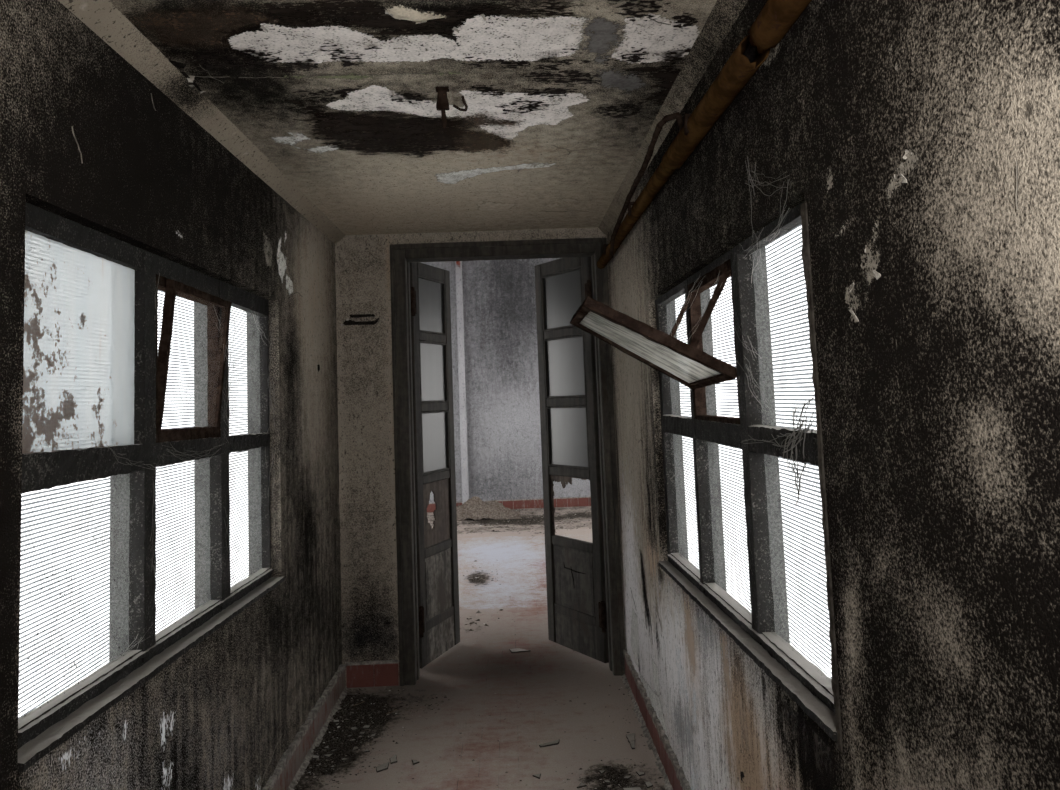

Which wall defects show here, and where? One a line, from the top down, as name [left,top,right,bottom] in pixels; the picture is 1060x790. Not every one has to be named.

peeling [228,14,589,64]
peeling [611,13,699,64]
damp [128,0,698,159]
peeling [326,85,589,141]
peeling [435,162,555,184]
peeling [263,231,293,295]
damp [640,549,660,657]
damp [160,712,175,751]
damp [759,675,843,788]